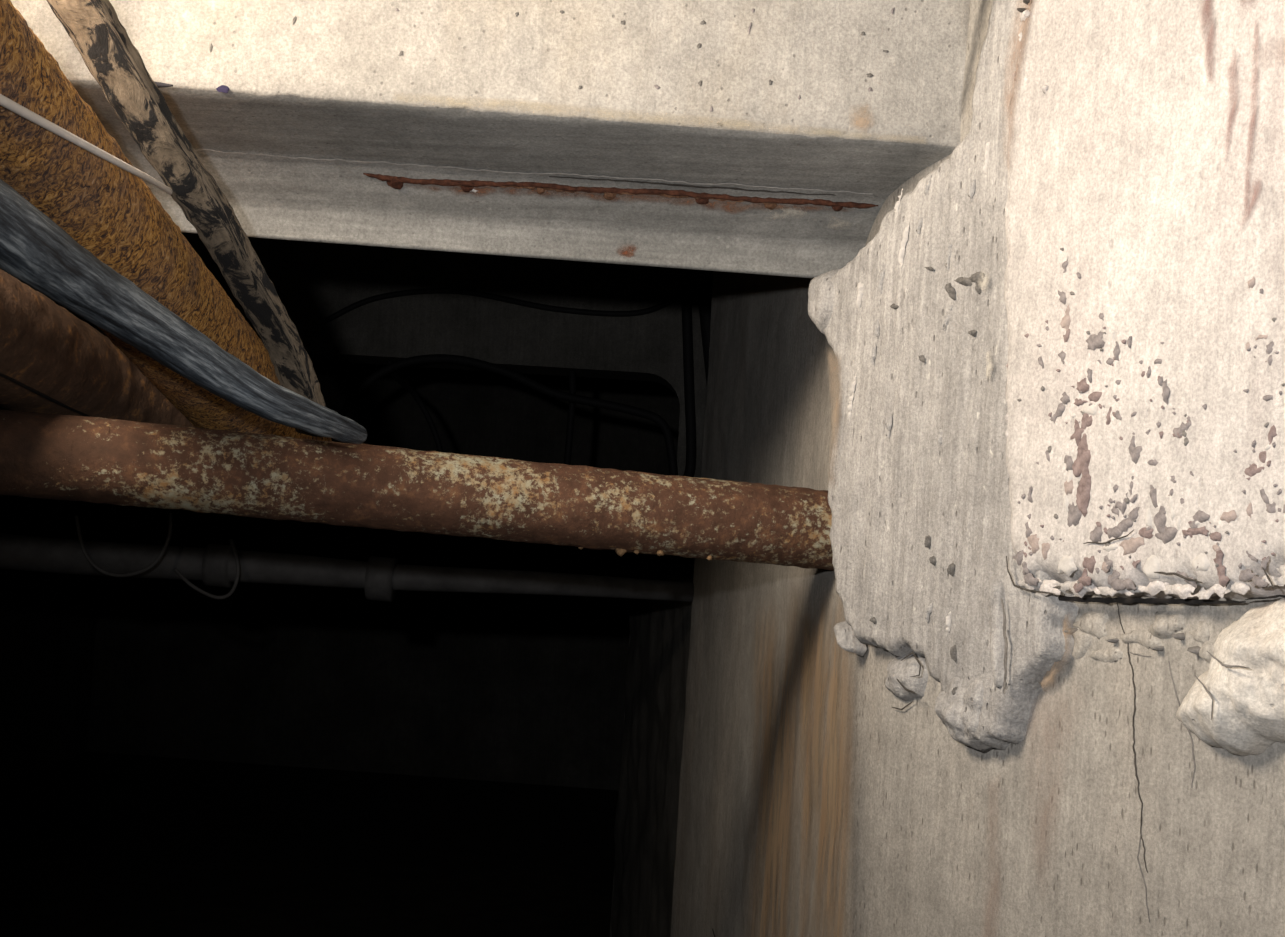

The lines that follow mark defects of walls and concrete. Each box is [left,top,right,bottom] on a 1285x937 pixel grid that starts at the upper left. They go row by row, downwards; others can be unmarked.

spalling [1005,0,1032,118]
corrosion [1203,0,1213,56]
corrosion [1246,110,1258,213]
spalling [1006,313,1285,663]
crack [1058,595,1285,923]